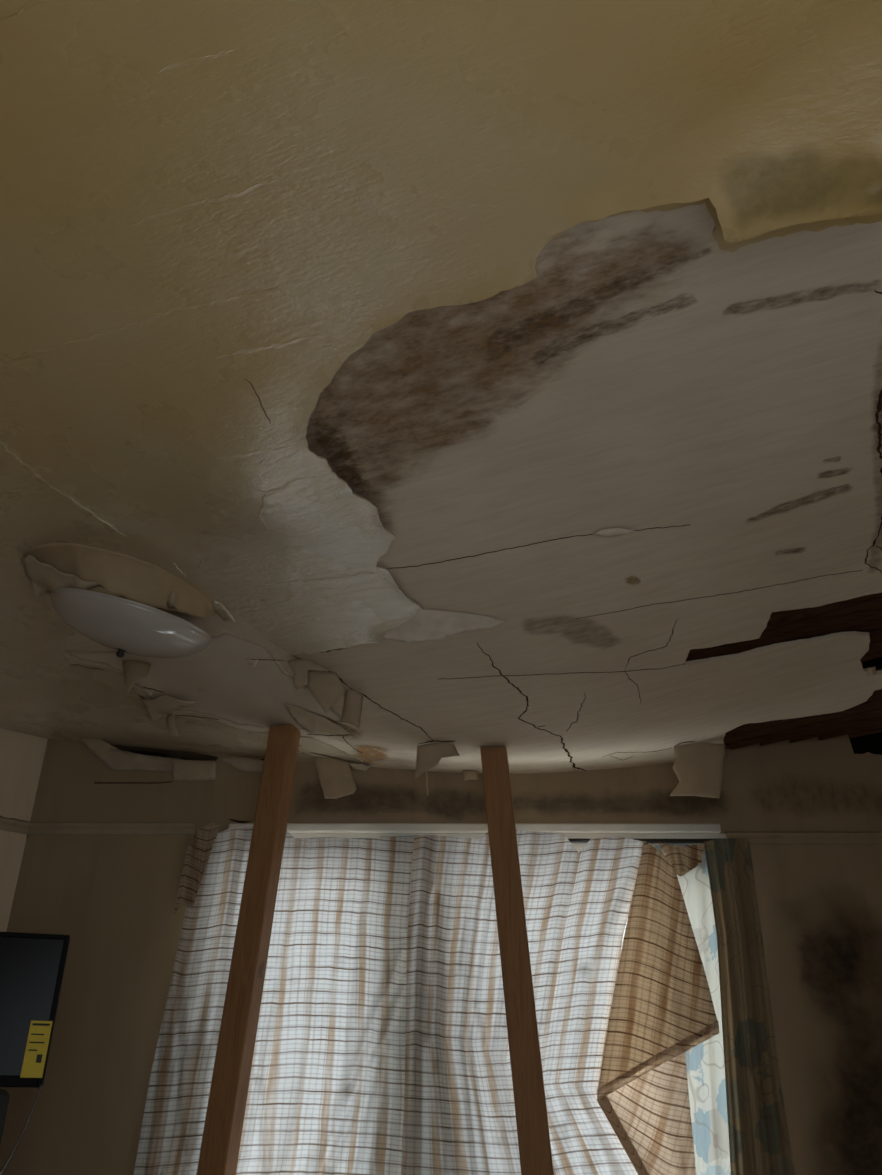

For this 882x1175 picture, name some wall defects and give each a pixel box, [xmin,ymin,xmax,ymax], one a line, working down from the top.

peeling [581,198,882,252]
peeling [0,0,716,781]
crack [387,534,593,569]
water stain [310,243,686,496]
crack [442,516,882,771]
crack [874,390,882,474]